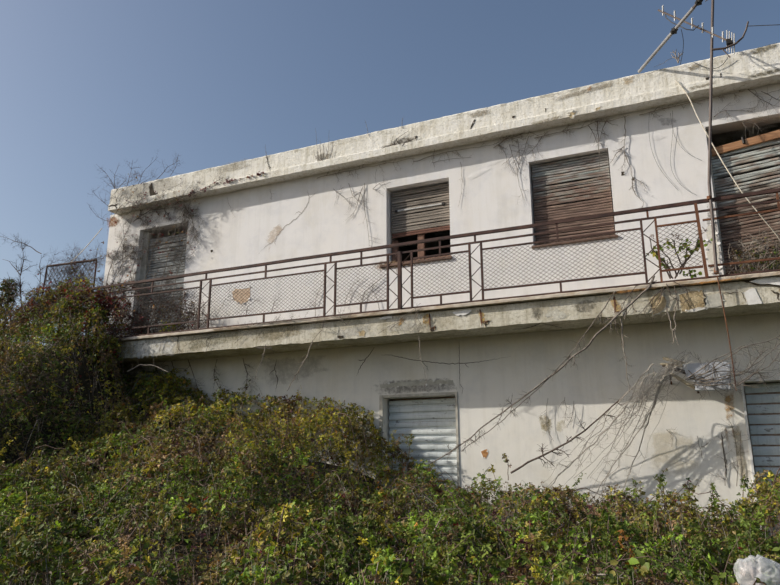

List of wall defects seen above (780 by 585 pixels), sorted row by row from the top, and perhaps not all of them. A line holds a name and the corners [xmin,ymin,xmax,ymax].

peeling [232,286,252,305]
spalling [678,289,707,313]
peeling [743,288,762,305]